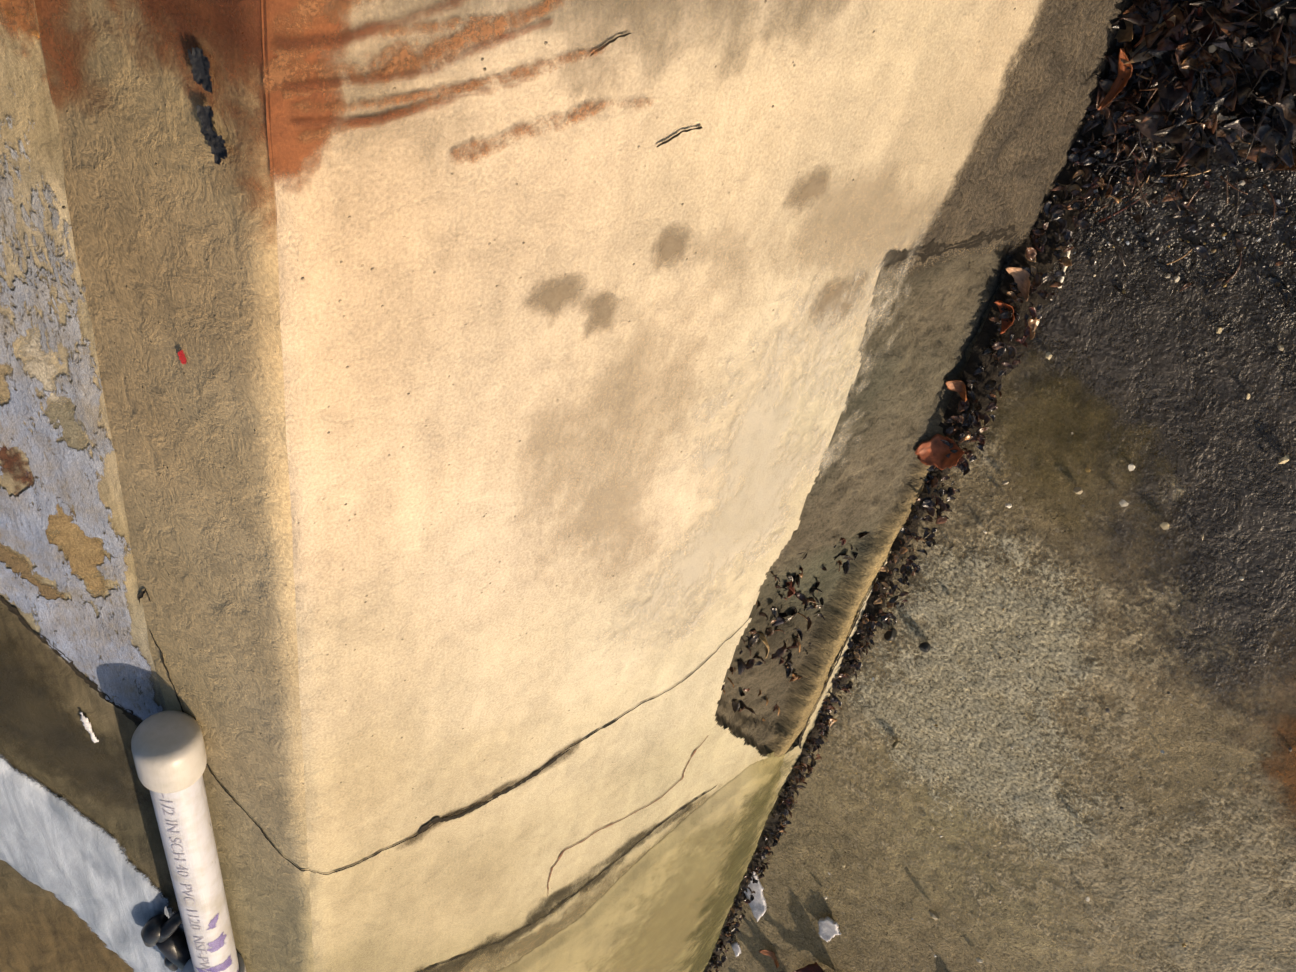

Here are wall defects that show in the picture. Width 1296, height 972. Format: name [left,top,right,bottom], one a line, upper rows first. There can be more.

corrosion [0,0,86,105]
corrosion [138,0,601,223]
corrosion [550,101,611,127]
damp [792,172,827,206]
damp [531,278,615,329]
peeling [0,330,89,455]
peeling [0,446,35,496]
damp [633,275,888,637]
peeling [0,497,109,600]
damp [815,137,1296,972]
crack [137,589,184,712]
crack [206,618,750,875]